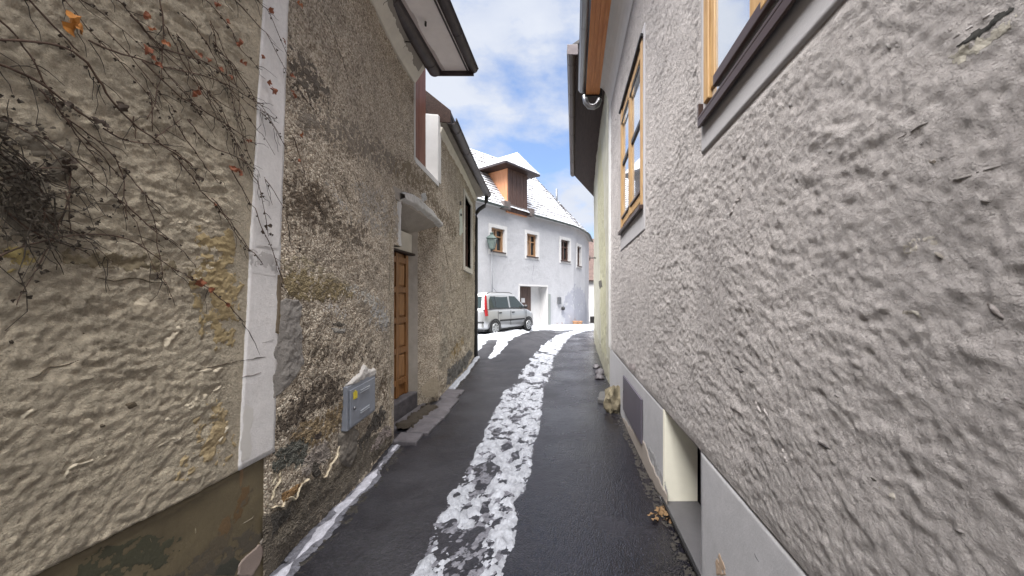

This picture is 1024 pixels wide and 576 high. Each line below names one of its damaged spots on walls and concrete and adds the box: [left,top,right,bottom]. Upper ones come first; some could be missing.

spalling [948,14,1017,65]
spalling [267,226,393,509]